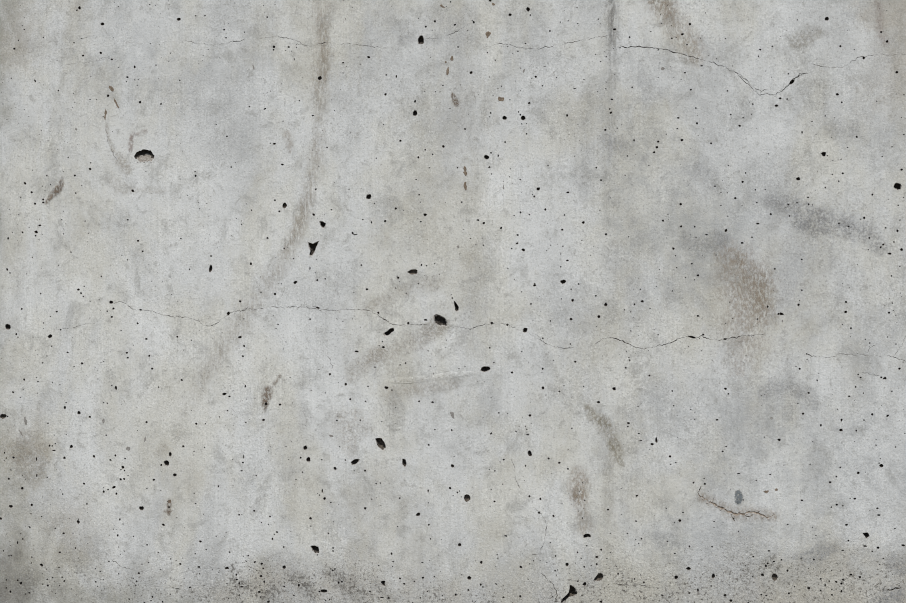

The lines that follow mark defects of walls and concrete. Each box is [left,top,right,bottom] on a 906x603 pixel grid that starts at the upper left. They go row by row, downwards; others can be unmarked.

crack [492,35,895,96]
crack [595,334,763,349]
crack [697,487,774,521]